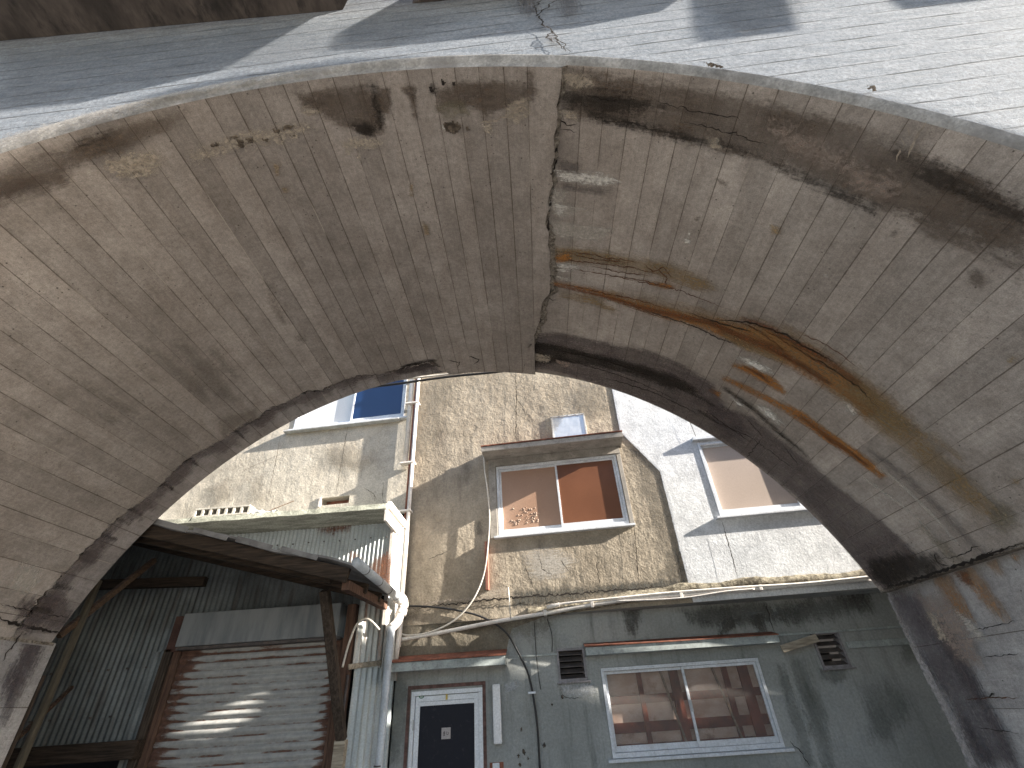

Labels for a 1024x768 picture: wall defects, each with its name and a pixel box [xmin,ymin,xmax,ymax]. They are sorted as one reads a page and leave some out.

crack [533,0,571,53]
leakage [300,86,417,137]
leakage [432,81,531,116]
peeling [195,124,310,159]
leakage [560,70,1024,264]
crack [535,80,576,338]
corrosion [553,247,997,517]
leakage [513,333,1020,768]
crack [886,543,1022,589]
crack [0,616,62,662]